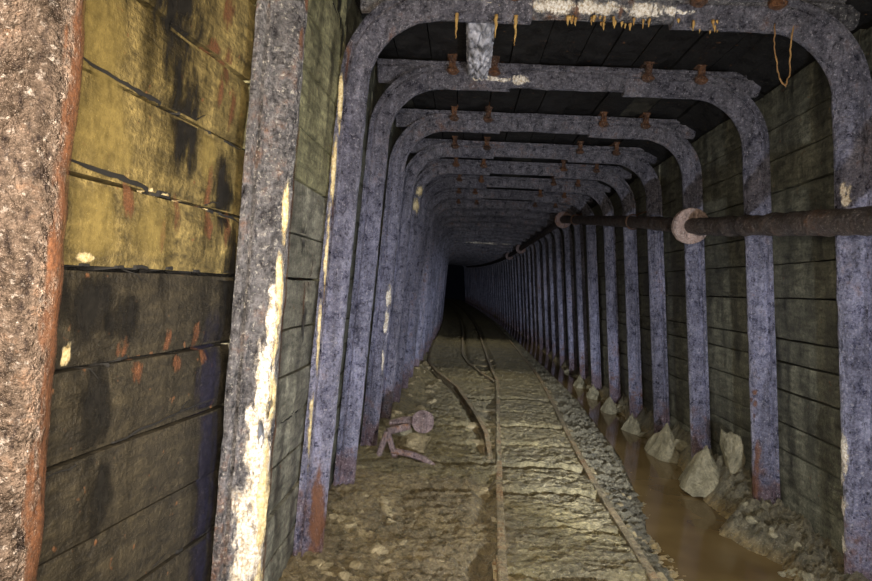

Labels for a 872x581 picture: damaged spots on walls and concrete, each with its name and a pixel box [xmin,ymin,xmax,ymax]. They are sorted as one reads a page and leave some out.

leakage [530,0,695,18]
leakage [78,0,130,167]
leakage [76,187,111,262]
leakage [137,188,178,251]
leakage [153,0,236,581]
rust [309,464,326,553]